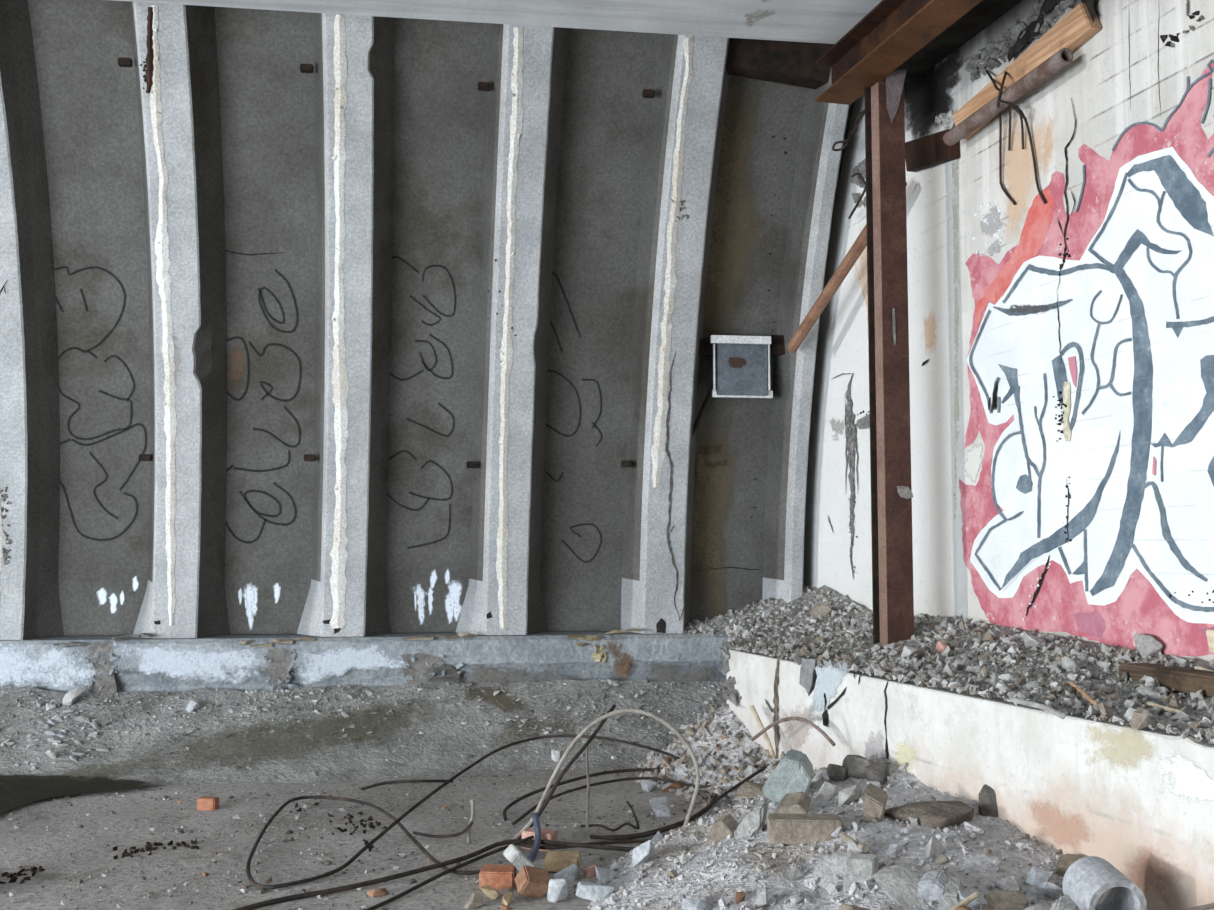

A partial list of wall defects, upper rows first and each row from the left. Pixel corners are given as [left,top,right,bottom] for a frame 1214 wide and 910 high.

crack [1053,99,1076,442]
crack [666,352,760,621]
crack [1019,476,1072,621]
spalling [53,620,160,694]
spalling [239,637,315,691]
spalling [401,632,477,685]
crack [853,670,889,759]
water stain [0,775,164,814]
water stain [1092,729,1214,802]